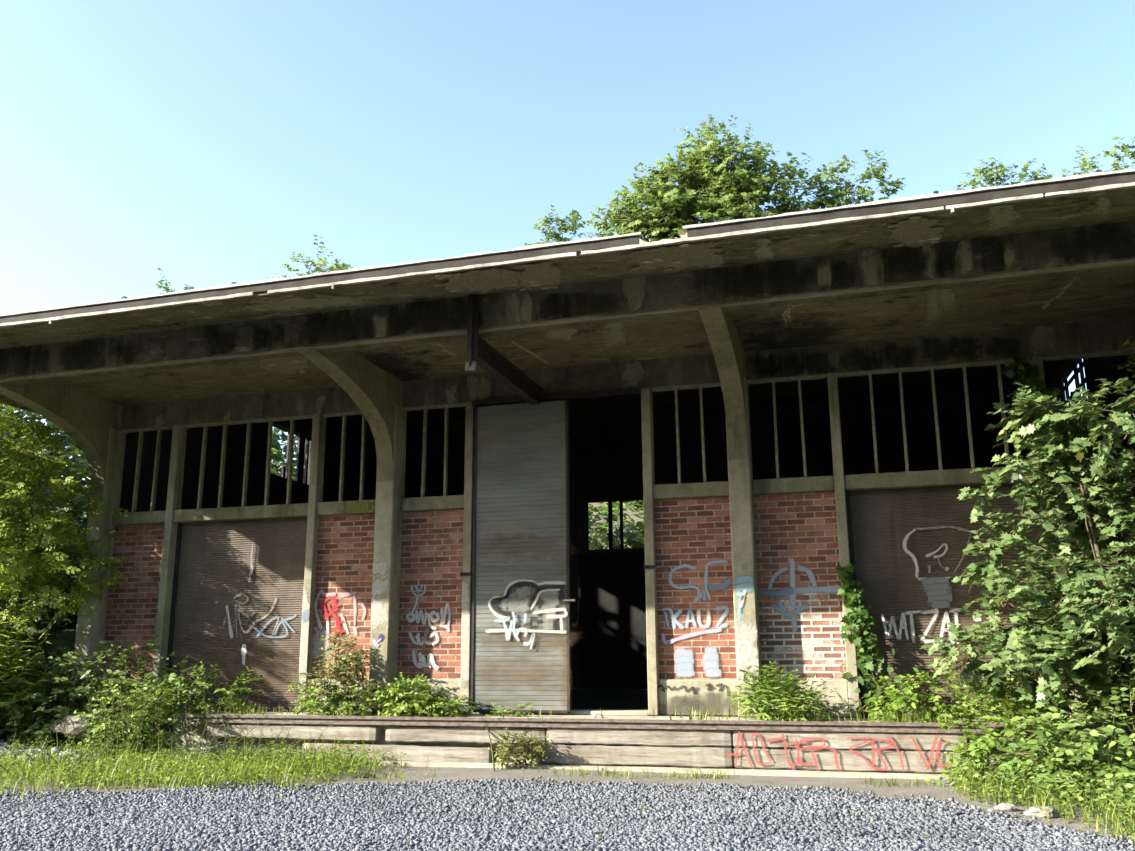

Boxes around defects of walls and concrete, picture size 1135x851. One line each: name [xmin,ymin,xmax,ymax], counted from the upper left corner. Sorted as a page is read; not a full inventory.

spalling [881,216,944,247]
water stain [1053,194,1135,264]
water stain [249,295,483,345]
spalling [435,261,563,294]
water stain [507,276,647,323]
water stain [704,205,1057,378]
water stain [0,339,135,376]
water stain [366,351,431,381]